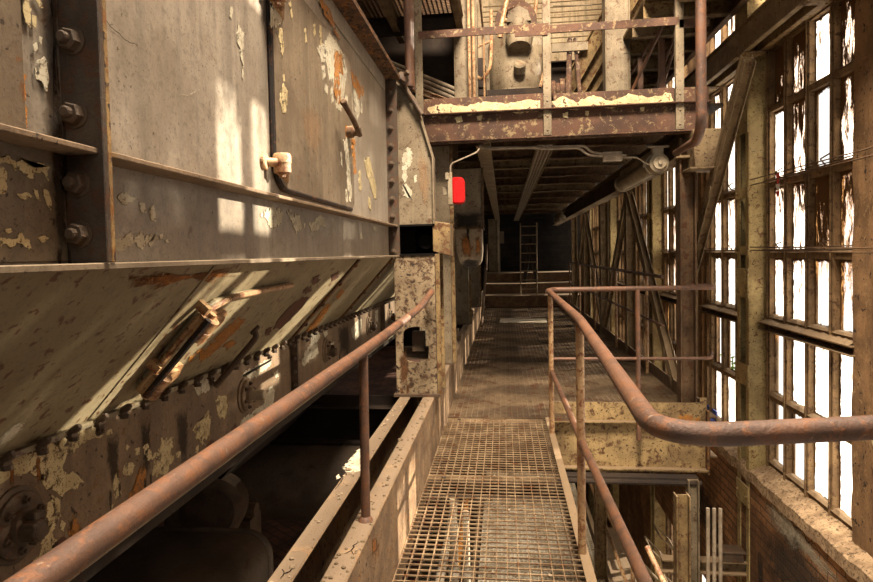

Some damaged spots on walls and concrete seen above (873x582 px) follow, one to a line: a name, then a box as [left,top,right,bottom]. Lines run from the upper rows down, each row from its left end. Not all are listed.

peeling [22,0,49,92]
corrosion [333,50,364,105]
peeling [428,99,540,123]
peeling [552,92,673,118]
peeling [0,154,52,210]
peeling [0,228,49,249]
corrosion [135,270,227,290]
corrosion [188,317,245,363]
peeling [0,426,112,563]
peeling [111,437,181,510]